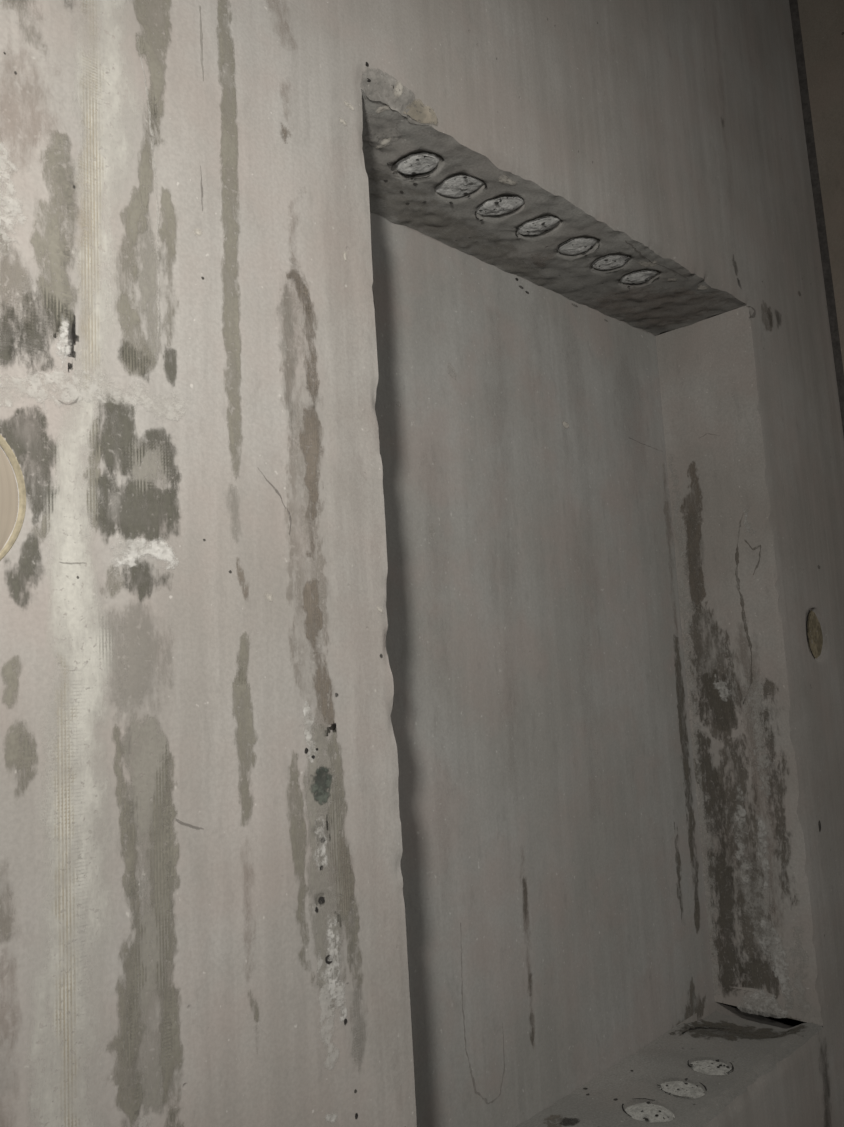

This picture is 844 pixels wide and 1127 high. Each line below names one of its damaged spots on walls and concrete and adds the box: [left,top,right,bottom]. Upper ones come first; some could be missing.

water stain [671,458,810,1025]